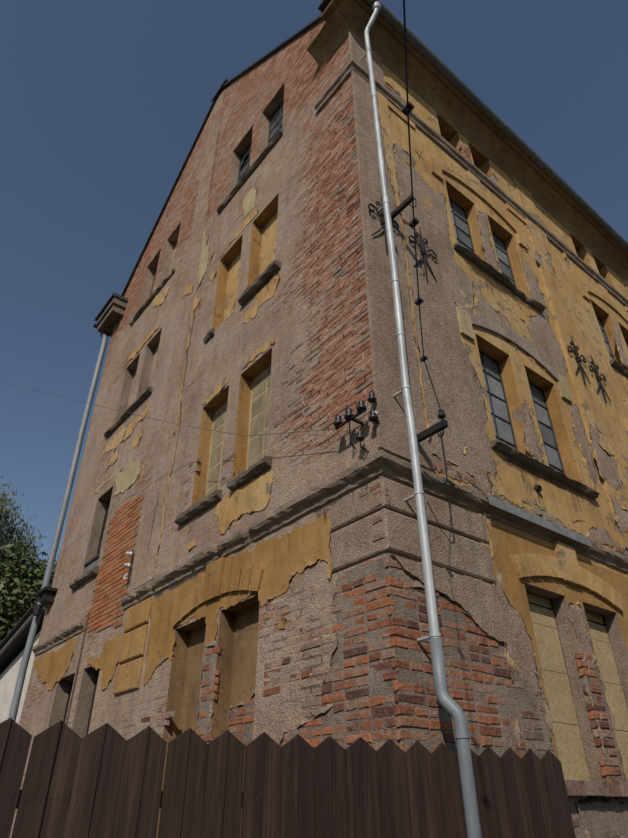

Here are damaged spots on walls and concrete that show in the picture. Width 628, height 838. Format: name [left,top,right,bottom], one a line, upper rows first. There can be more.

flaking render [318,87,364,310]
flaking render [376,81,628,556]
flaking render [273,342,311,434]
flaking render [354,343,375,419]
peeling [215,454,274,535]
peeling [33,637,76,691]
peeling [86,634,123,691]
flaking render [141,511,555,761]
flaking render [568,601,628,782]